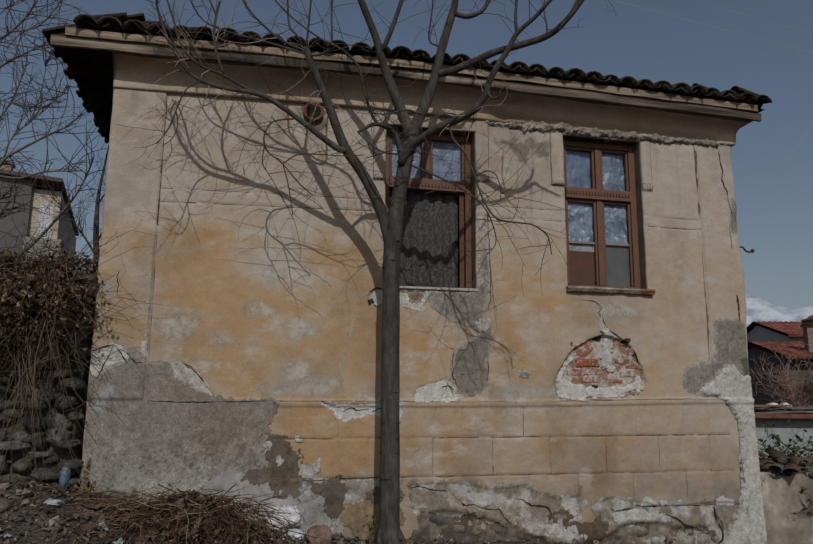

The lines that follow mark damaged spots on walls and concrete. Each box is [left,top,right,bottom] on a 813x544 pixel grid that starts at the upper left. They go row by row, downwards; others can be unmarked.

crack [489,124,696,145]
crack [718,152,733,246]
peeling [400,289,428,312]
crack [588,300,642,367]
peeling [90,342,130,378]
peeling [170,361,214,396]
peeling [414,378,462,403]
spalling [555,328,646,402]
peeling [321,401,381,422]
peeling [339,474,380,539]
peeling [400,475,740,544]
crack [612,503,737,544]